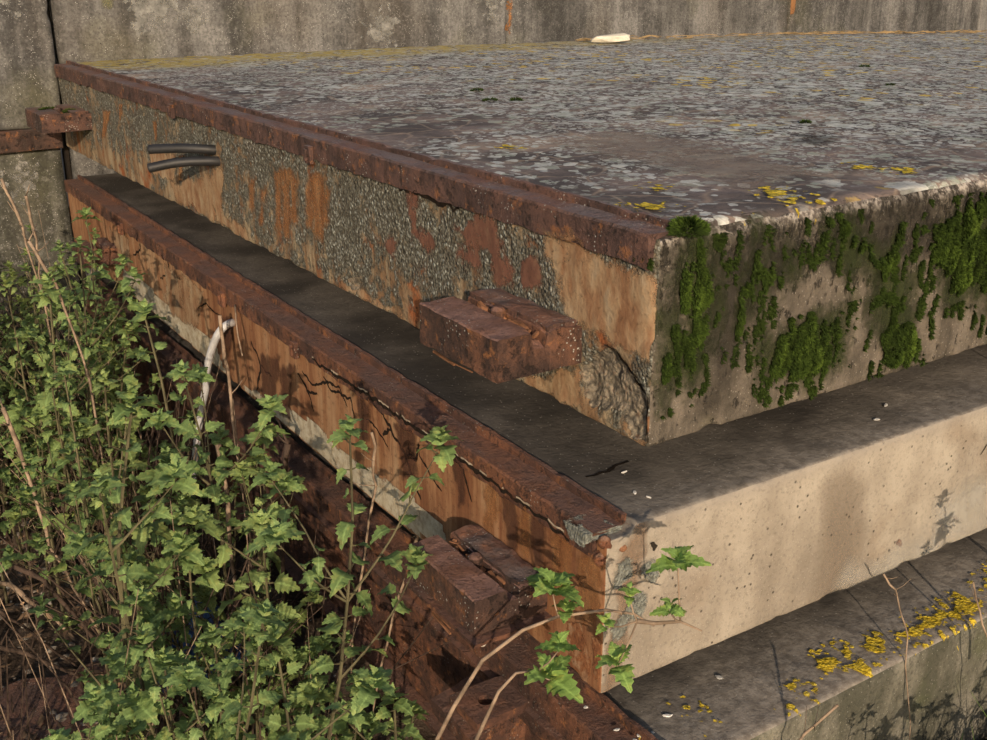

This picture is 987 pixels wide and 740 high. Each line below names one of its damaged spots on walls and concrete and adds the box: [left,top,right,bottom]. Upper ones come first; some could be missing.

corrosion [249,169,329,240]
corrosion [454,212,542,292]
corrosion [222,317,233,350]
crack [251,342,271,399]
corrosion [260,354,295,419]
corrosion [357,399,371,441]
corrosion [393,424,417,479]
crack [297,357,569,542]
corrosion [452,459,465,506]
crack [585,460,630,477]